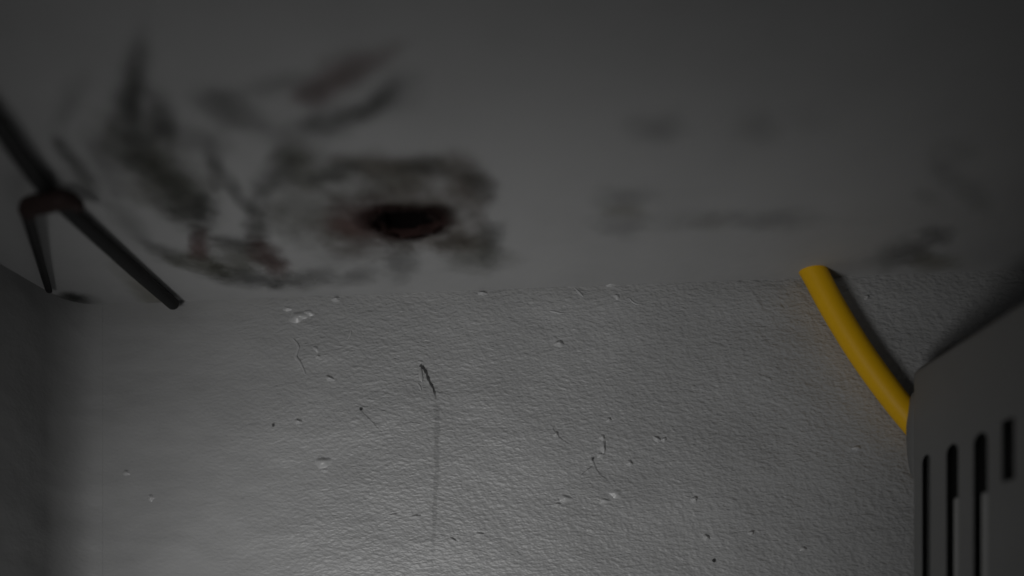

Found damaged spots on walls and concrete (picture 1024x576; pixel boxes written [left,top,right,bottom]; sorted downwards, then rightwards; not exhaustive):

spalling [358,206,451,241]
crack [418,361,436,394]